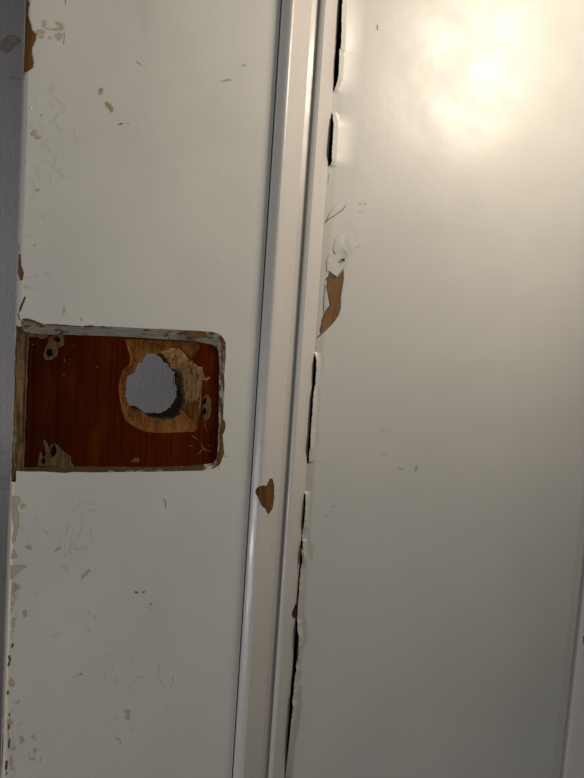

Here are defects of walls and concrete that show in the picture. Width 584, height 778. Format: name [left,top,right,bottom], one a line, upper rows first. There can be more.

peeling [0,0,36,76]
peeling [317,234,347,338]
peeling [255,479,275,514]
peeling [0,701,20,775]